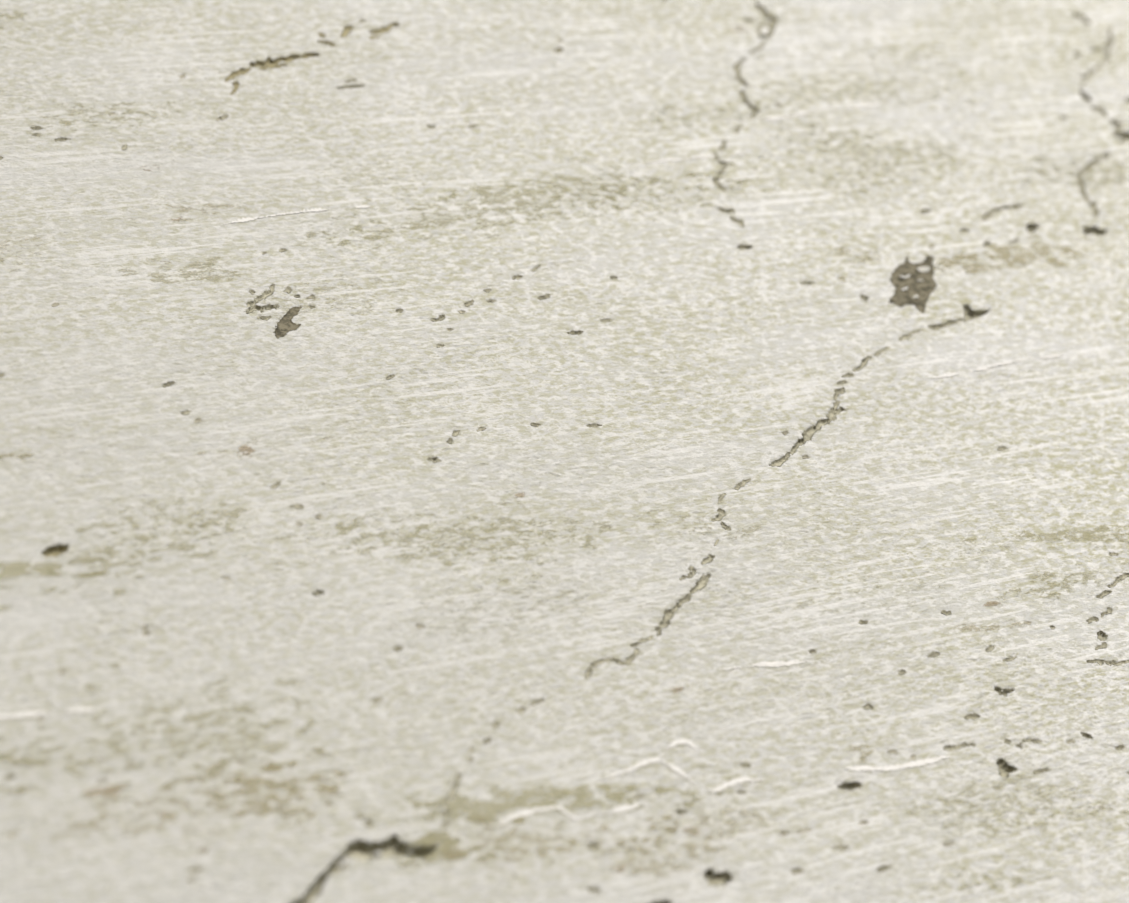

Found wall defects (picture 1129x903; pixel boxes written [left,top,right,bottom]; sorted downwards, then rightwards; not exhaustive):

crack [225,22,399,95]
crack [712,1,778,228]
crack [1073,14,1129,217]
spalling [889,244,937,313]
crack [585,304,991,678]
crack [294,697,545,903]
crack [943,742,976,751]
crack [1004,738,1042,749]